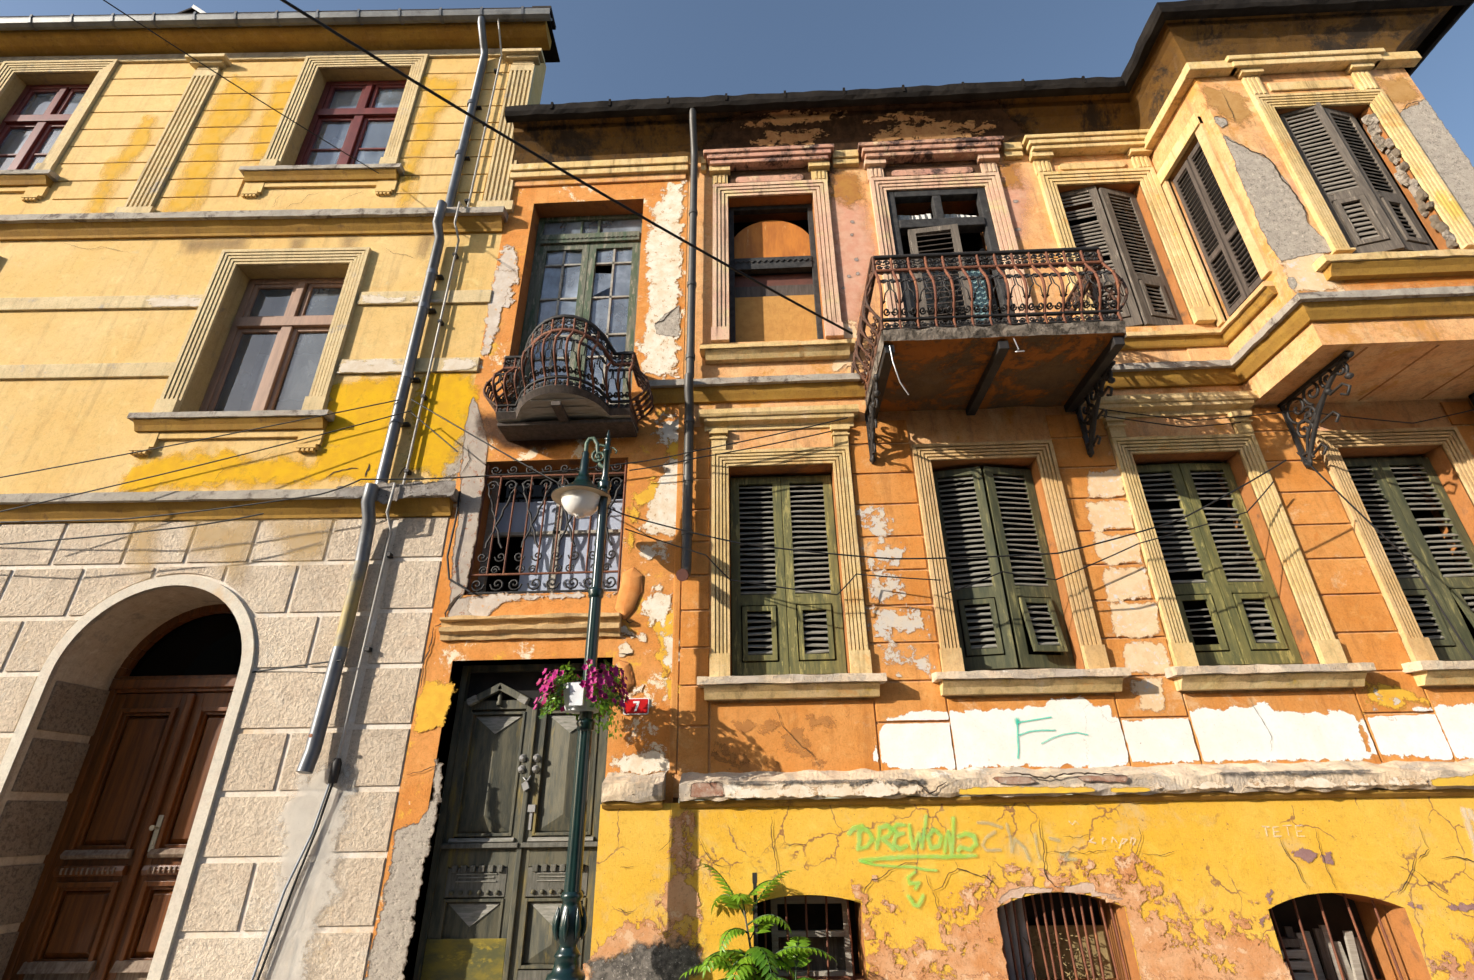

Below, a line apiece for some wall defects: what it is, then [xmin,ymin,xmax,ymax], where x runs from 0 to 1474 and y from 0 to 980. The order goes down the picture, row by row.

spalling [1199,85,1345,293]
peeling [634,180,687,380]
peeling [624,412,685,562]
peeling [855,505,936,678]
peeling [1085,467,1172,713]
peeling [413,680,455,733]
spalling [364,759,443,980]
peeling [582,714,927,980]
crack [771,817,807,891]
crack [864,862,995,911]
peeling [851,850,1292,980]
crack [1039,821,1174,887]